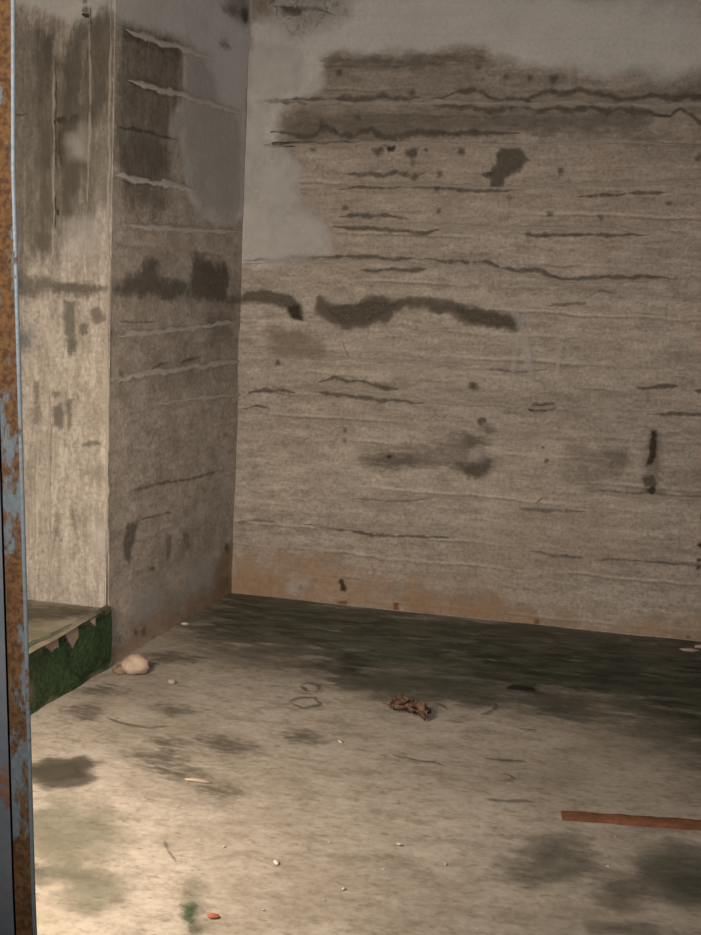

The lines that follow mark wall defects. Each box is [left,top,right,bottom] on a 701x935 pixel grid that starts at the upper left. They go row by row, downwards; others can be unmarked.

crack [257,0,346,33]
crack [120,127,177,140]
damp [18,255,229,301]
damp [237,290,303,321]
damp [315,296,518,331]
damp [647,430,656,464]
damp [643,476,655,494]
damp [204,593,701,735]
damp [32,756,96,787]